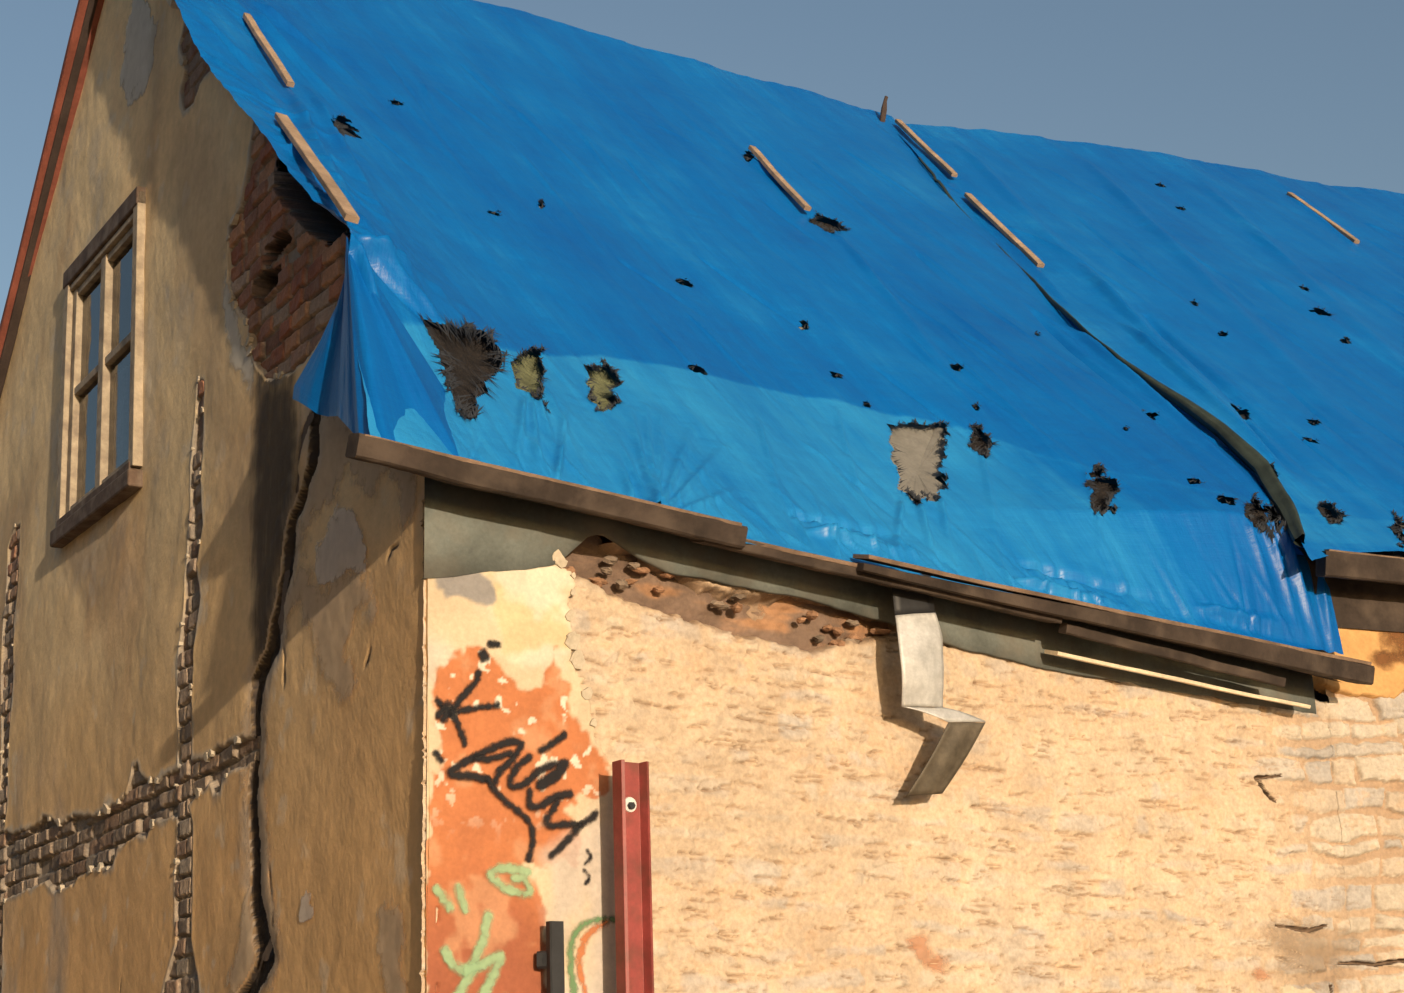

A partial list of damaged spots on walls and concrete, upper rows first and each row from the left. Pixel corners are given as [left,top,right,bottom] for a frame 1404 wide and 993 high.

flaking render [120,0,158,106]
flaking render [226,123,351,380]
crack [258,413,321,717]
flaking render [283,415,416,700]
flaking render [0,376,262,993]
flaking render [1310,627,1404,699]
flaking render [426,535,891,993]
crack [248,840,275,993]
flaking render [377,905,406,993]
crack [1275,924,1327,933]
crack [1329,959,1404,993]